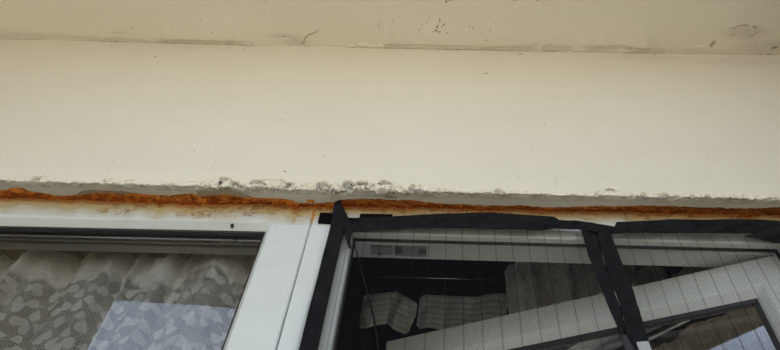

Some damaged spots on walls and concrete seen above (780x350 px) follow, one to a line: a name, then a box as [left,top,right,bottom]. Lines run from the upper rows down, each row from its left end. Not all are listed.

peeling [0,167,780,205]
rust [0,188,780,224]